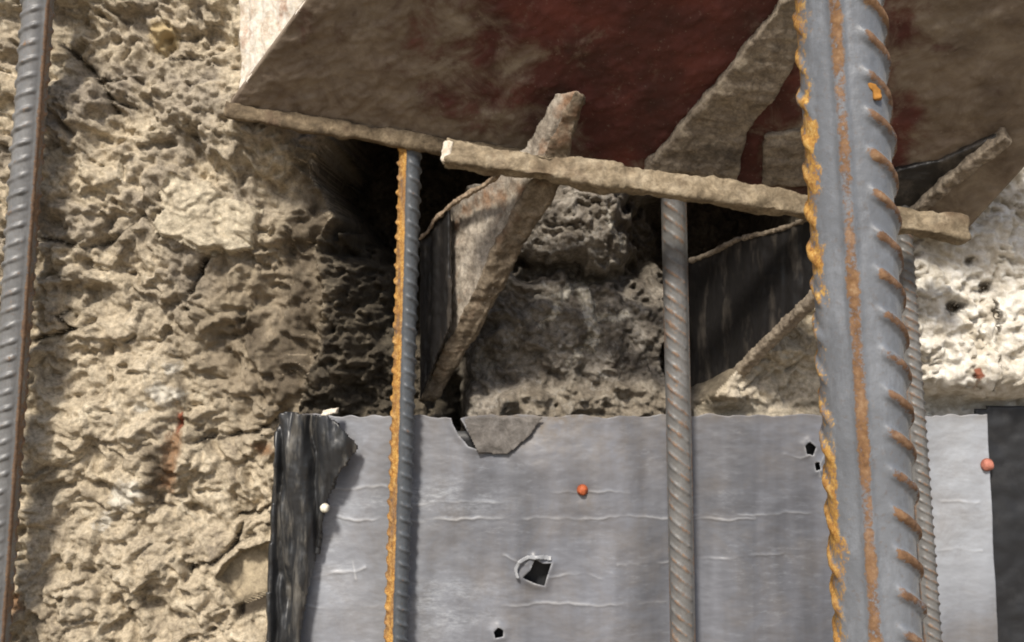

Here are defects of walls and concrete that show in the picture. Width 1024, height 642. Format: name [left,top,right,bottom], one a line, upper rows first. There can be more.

spalling [299,0,943,642]
spalling [946,302,964,314]
rust [159,412,184,489]